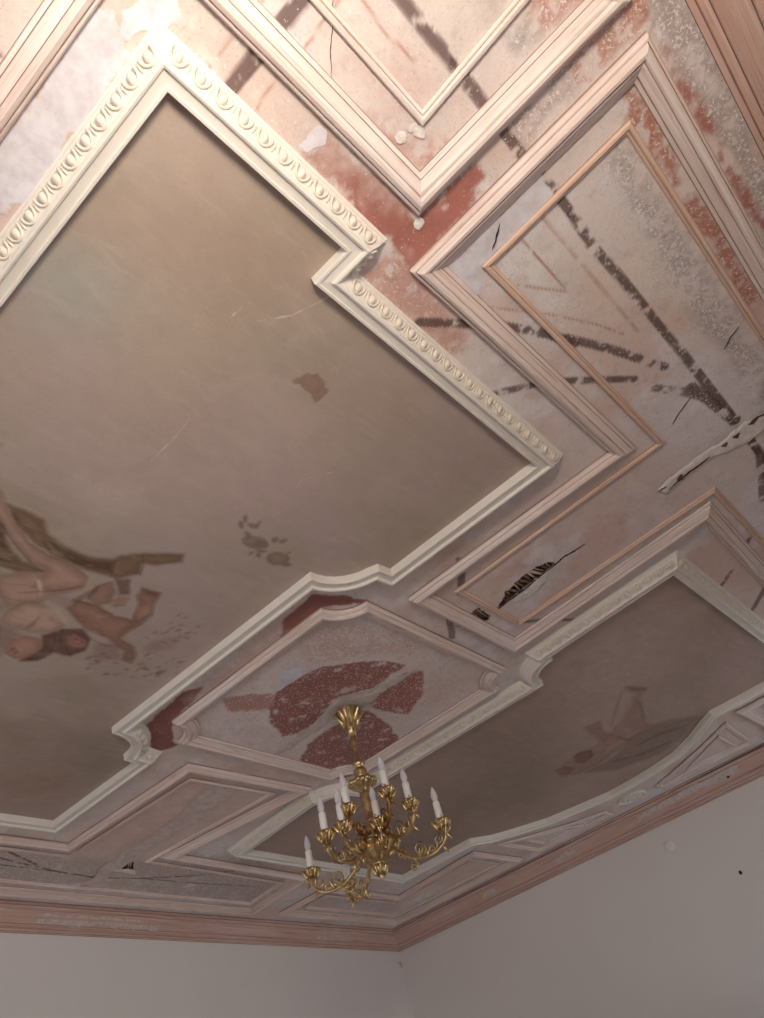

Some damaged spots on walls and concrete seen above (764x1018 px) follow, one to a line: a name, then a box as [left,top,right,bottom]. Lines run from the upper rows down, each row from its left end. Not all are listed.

flaking render [0,0,190,217]
peeling [413,217,425,230]
leakage [291,371,329,403]
flaking render [276,664,303,691]